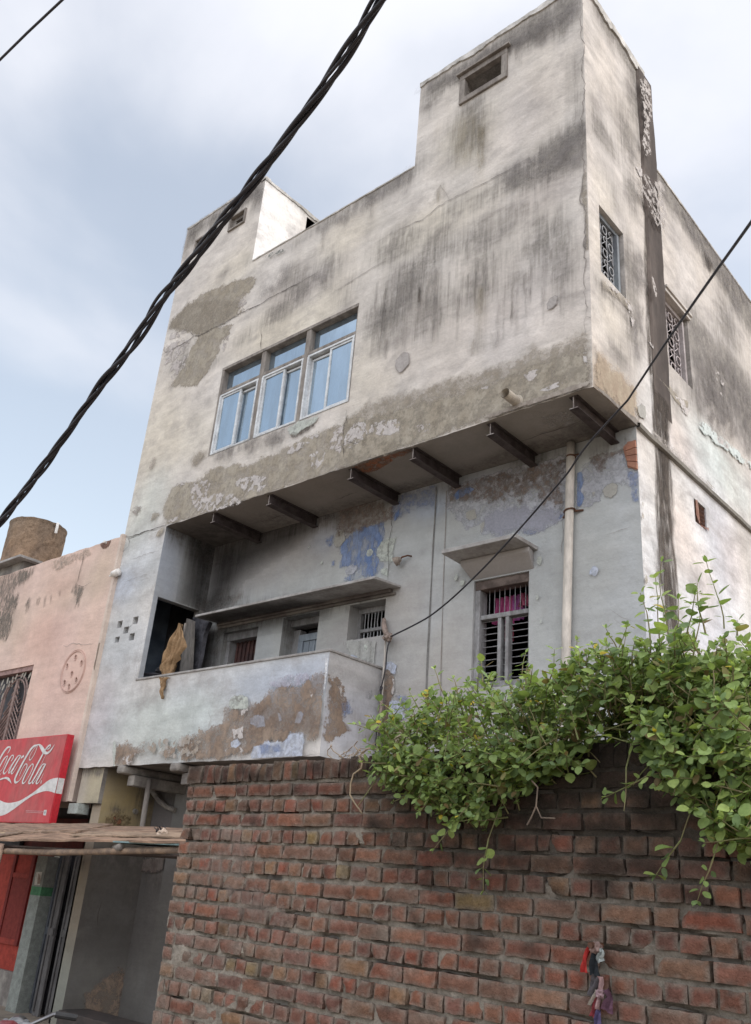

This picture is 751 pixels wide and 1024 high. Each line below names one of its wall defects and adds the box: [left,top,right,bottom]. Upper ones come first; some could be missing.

peeling [640,79,653,156]
peeling [636,167,669,250]
water stain [687,217,745,307]
flaking render [163,276,256,387]
peeling [151,416,402,536]
peeling [445,440,638,537]
spalling [484,381,640,427]
water stain [636,203,679,648]
peeling [700,422,751,468]
peeling [320,522,396,581]
water stain [0,570,33,637]
flaking render [113,672,351,766]